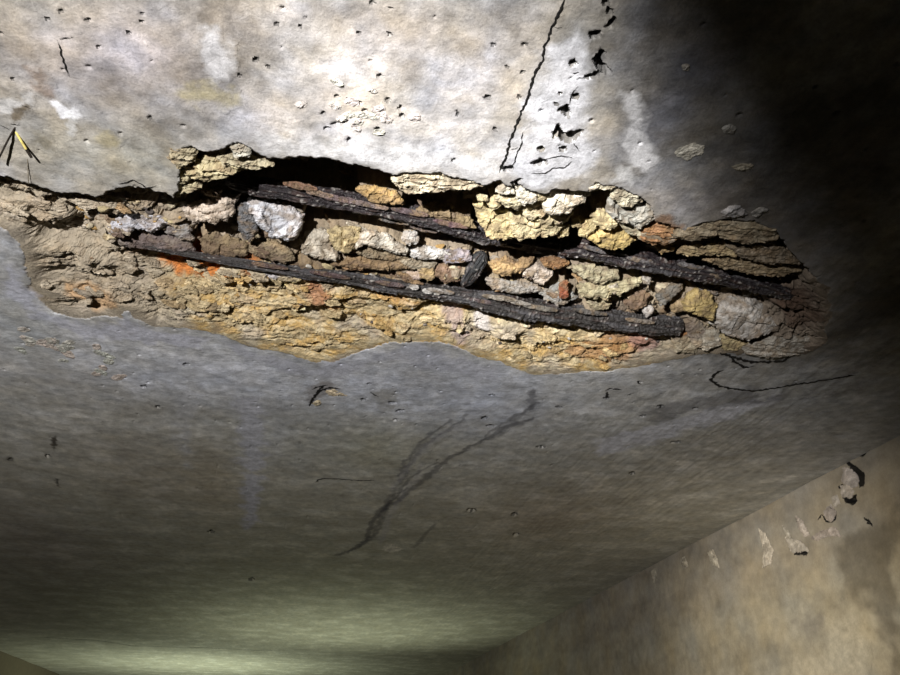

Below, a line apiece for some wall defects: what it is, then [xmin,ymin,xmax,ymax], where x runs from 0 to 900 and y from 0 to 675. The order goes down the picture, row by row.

crack [499,0,564,173]
spalling [531,0,617,174]
corrosion [61,277,124,315]
spalling [0,142,833,375]
corrosion [142,174,832,365]
crack [709,353,854,392]
peeling [758,528,774,568]
spalling [782,453,866,556]